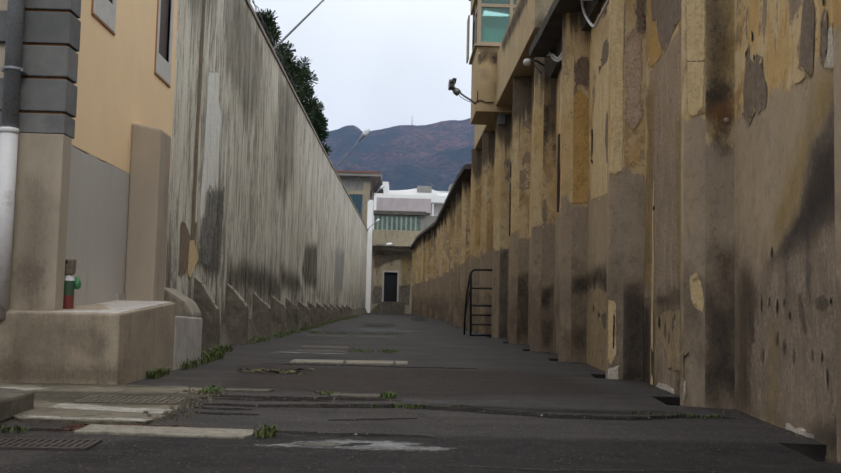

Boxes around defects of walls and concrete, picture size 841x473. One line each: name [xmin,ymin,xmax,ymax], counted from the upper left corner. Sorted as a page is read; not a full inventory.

peeling [742,31,767,126]
peeling [794,0,834,83]
flaking render [572,0,705,316]
peeling [586,287,620,379]
flaking render [656,380,686,406]